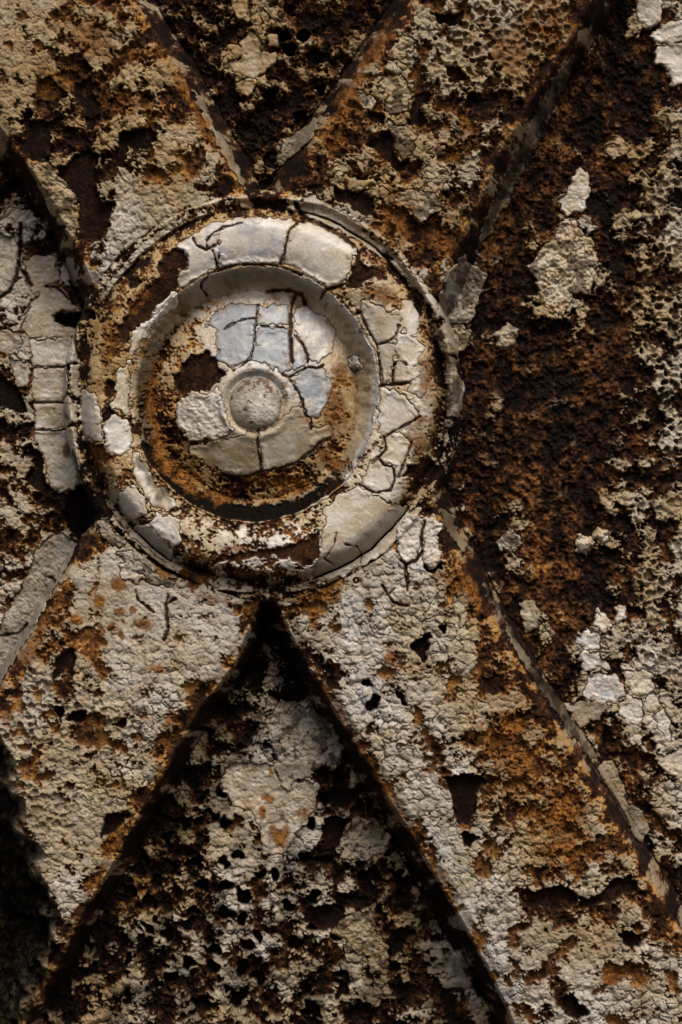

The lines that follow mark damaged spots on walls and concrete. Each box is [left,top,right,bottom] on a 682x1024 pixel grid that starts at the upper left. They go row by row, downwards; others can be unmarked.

rust [174,76,218,147]
peeling [636,0,682,88]
peeling [526,168,599,321]
rust [147,359,233,504]
crack [195,205,353,477]
peeling [0,54,576,686]
crack [362,316,404,387]
crack [361,418,417,493]
crack [383,526,424,605]
peeling [482,582,682,843]
rust [259,794,290,848]
rust [478,711,607,870]